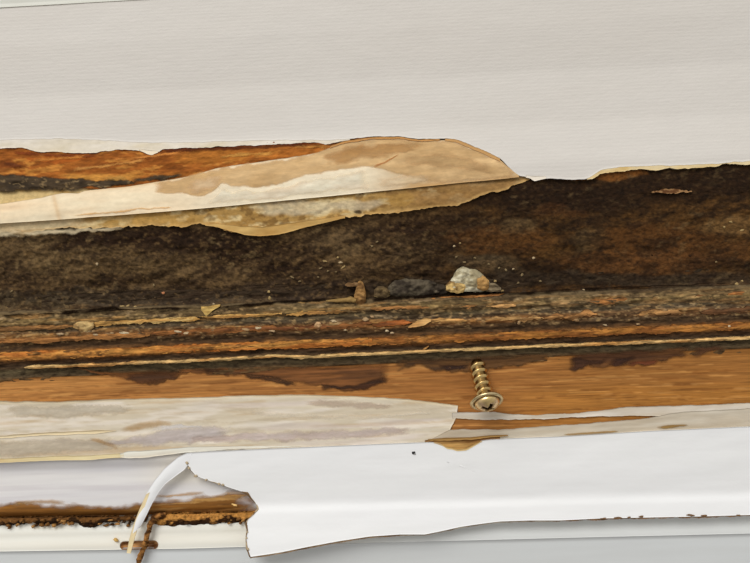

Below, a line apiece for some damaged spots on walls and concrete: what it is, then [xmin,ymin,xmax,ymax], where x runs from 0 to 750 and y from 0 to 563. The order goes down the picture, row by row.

corrosion [0,142,340,189]
leakage [0,174,179,192]
spalling [0,137,750,311]
leakage [399,354,547,373]
leakage [571,348,685,371]
leakage [82,365,386,391]
peeling [0,394,750,558]
leakage [0,493,251,517]